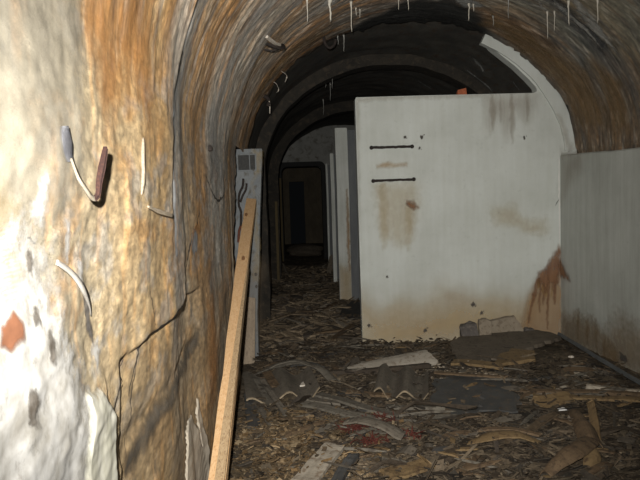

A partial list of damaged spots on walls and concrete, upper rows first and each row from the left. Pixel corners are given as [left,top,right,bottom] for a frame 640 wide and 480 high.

peeling [33,179,48,223]
peeling [0,218,99,480]
crack [114,290,195,453]
water stain [371,309,511,343]
corrosion [523,248,568,335]
flaking render [185,398,210,480]